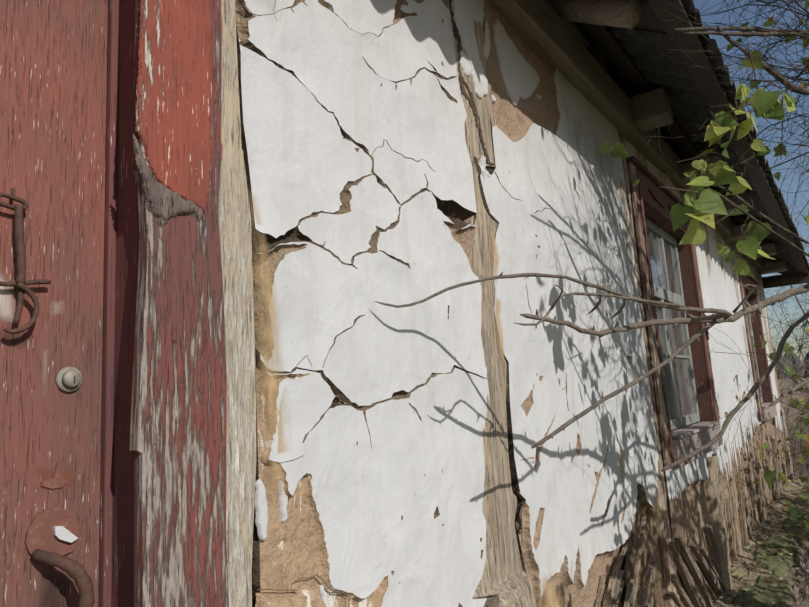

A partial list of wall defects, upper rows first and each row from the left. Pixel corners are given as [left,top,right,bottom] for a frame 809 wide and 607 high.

crack [238,0,395,37]
crack [237,41,434,269]
flaking render [393,0,424,24]
crack [362,0,550,223]
flaking render [442,0,561,142]
flaking render [251,226,312,361]
crack [255,315,487,466]
flaking render [252,368,401,607]
crack [516,492,524,547]
flaking render [512,484,665,607]
flaking render [668,476,717,607]
flaking render [709,366,786,571]